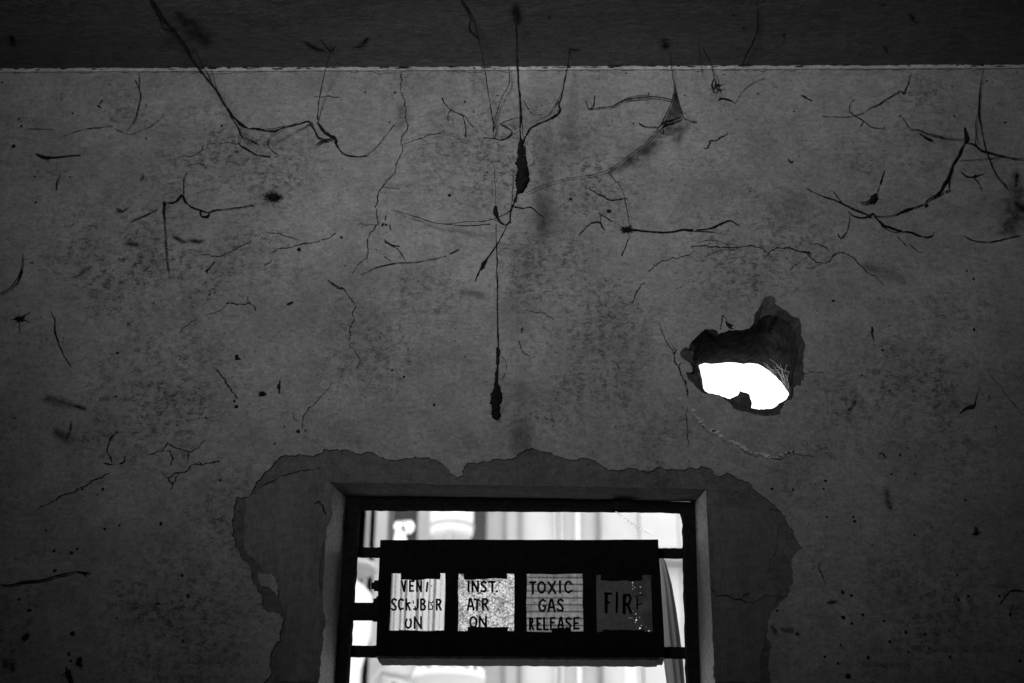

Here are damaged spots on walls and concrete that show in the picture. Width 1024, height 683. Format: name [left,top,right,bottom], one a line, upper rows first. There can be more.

crack [178,129,237,168]
crack [204,232,336,266]
crack [328,71,445,367]
hole [680,296,805,416]
spalling [232,449,802,683]